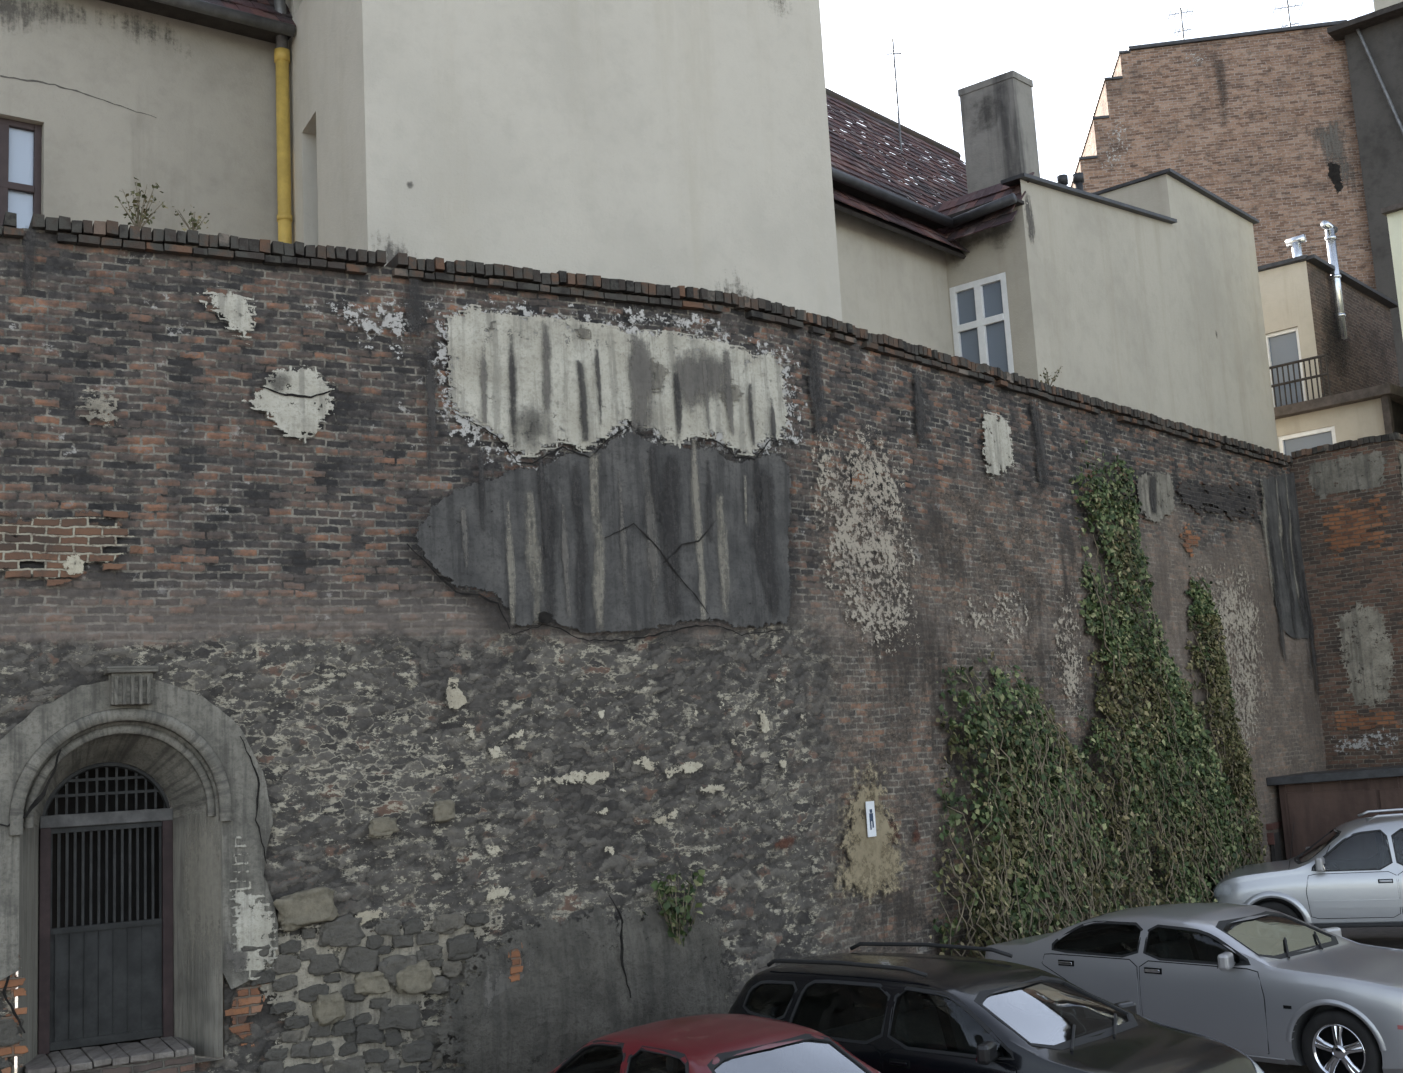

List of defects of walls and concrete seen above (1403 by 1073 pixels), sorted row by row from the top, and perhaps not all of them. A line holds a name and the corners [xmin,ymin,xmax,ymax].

leakage [0,0,84,27]
crack [0,75,156,118]
peeling [427,292,808,471]
crack [407,520,789,642]
spalling [368,816,399,838]
spalling [432,799,455,823]
spalling [225,903,506,1073]